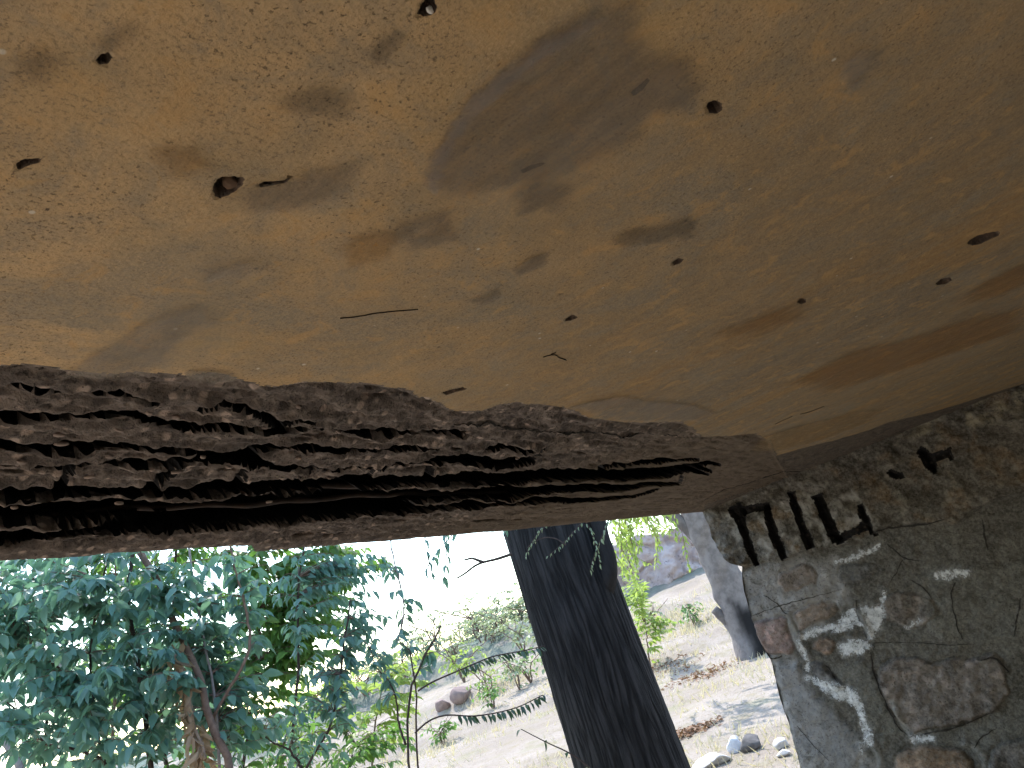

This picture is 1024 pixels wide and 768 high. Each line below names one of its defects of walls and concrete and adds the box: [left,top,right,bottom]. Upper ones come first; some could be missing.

spalling [210,173,293,201]
spalling [0,363,1024,593]